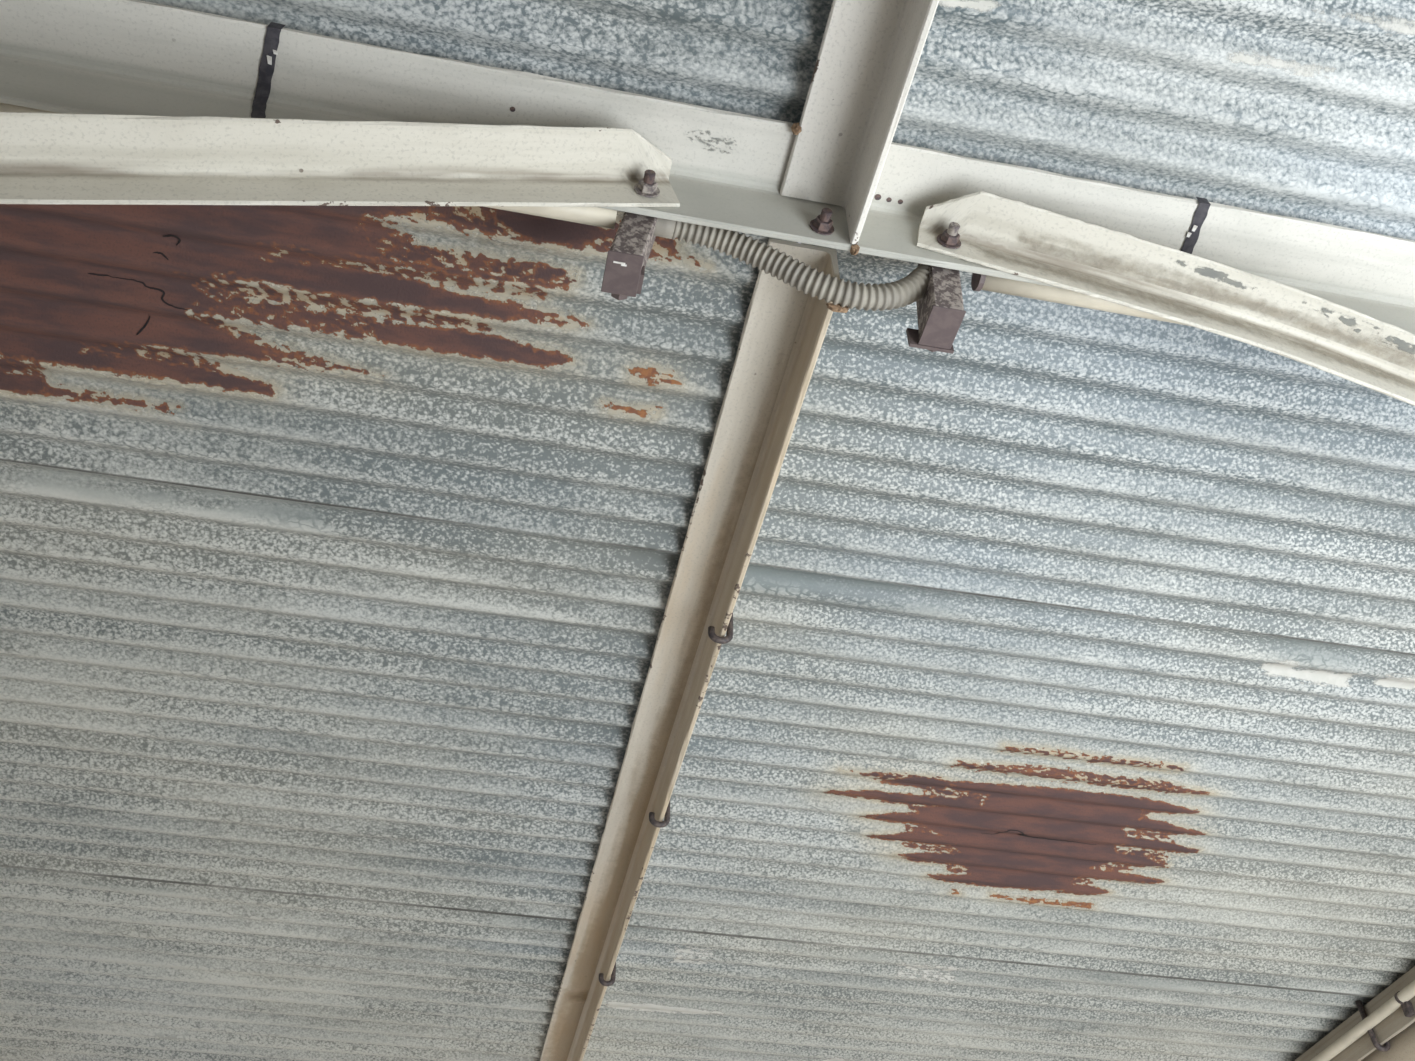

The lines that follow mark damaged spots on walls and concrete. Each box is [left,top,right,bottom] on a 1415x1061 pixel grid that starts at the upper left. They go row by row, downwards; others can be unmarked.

rust [648,236,711,268]
rust [0,204,621,415]
rust [629,367,682,386]
rust [601,401,663,418]
rust [824,743,1211,909]